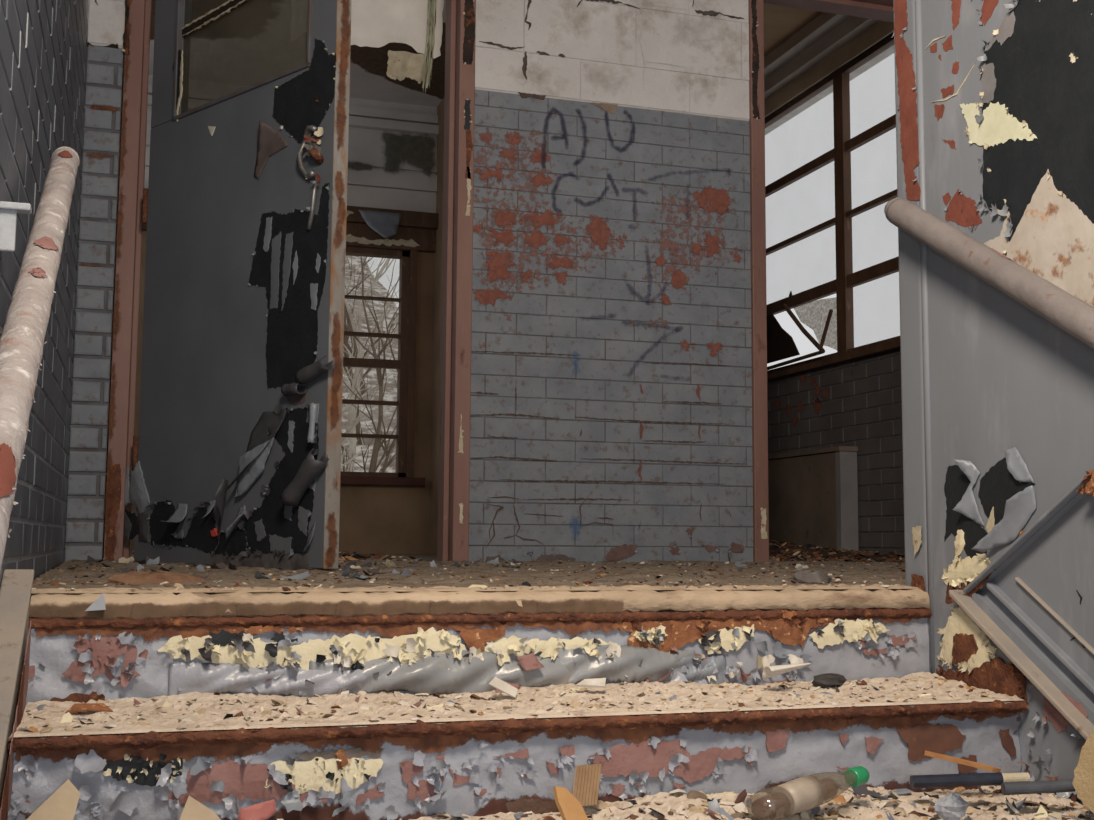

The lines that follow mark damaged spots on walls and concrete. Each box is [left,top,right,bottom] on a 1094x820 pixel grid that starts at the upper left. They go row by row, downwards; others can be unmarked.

rust [86,23,130,171]
rust [336,0,350,149]
peeling [891,0,921,201]
peeling [930,0,1094,307]
rust [331,314,342,428]
rust [103,452,121,561]
peeling [944,447,1036,558]
rust [1077,470,1094,496]
peeling [62,627,621,714]
rust [0,526,1028,820]
peeling [633,618,917,685]
peeling [74,749,399,820]